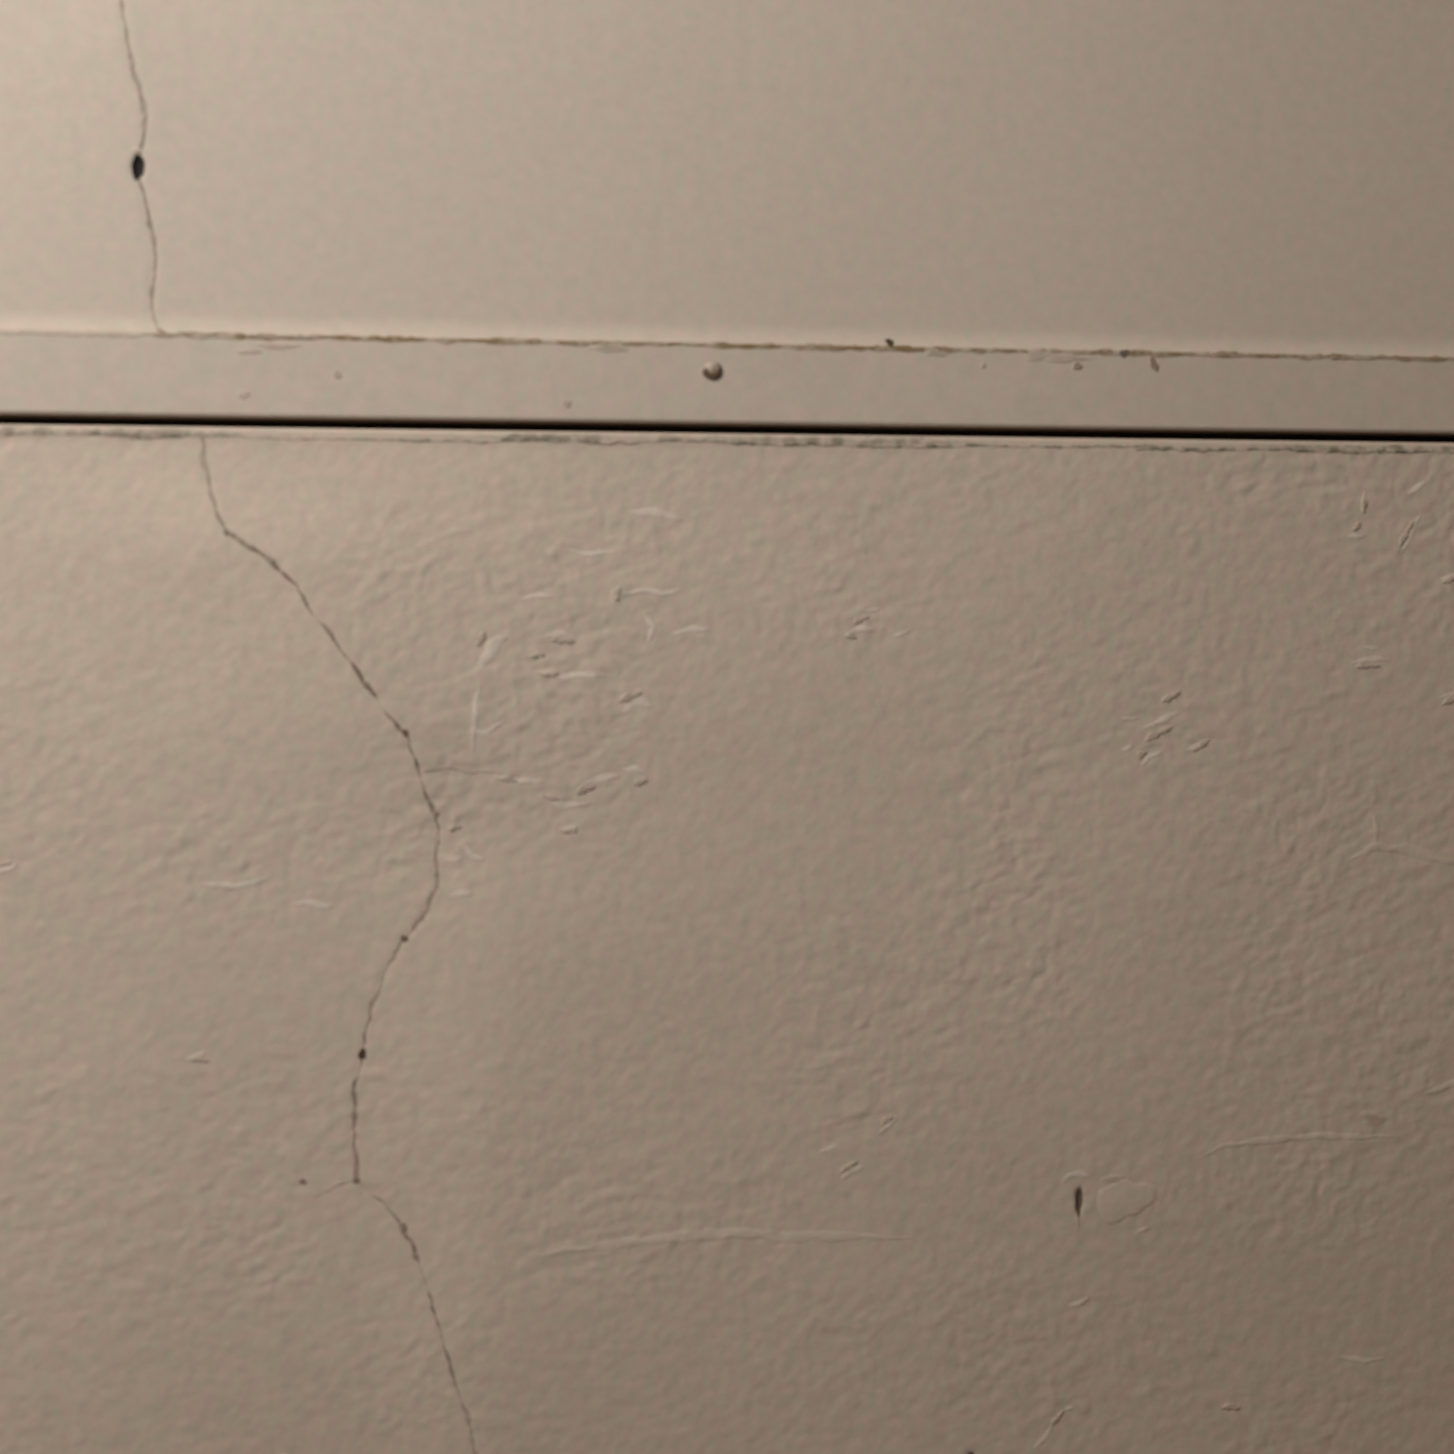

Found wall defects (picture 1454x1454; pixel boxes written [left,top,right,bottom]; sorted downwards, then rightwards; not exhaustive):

crack [119,0,178,337]
crack [0,431,1454,1454]